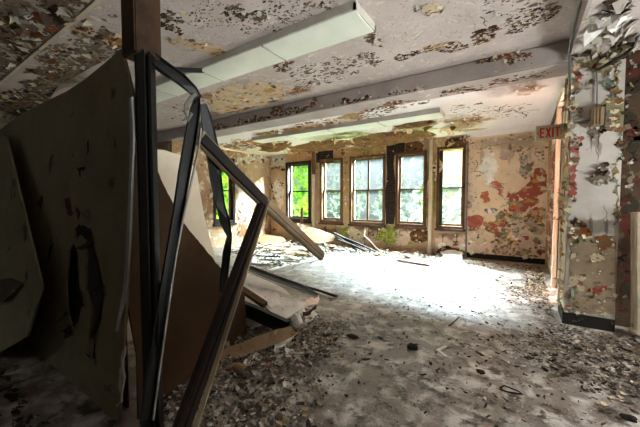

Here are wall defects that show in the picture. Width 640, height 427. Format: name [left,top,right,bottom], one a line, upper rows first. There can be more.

peeling [0,4,122,121]
peeling [160,0,341,57]
peeling [192,0,640,427]